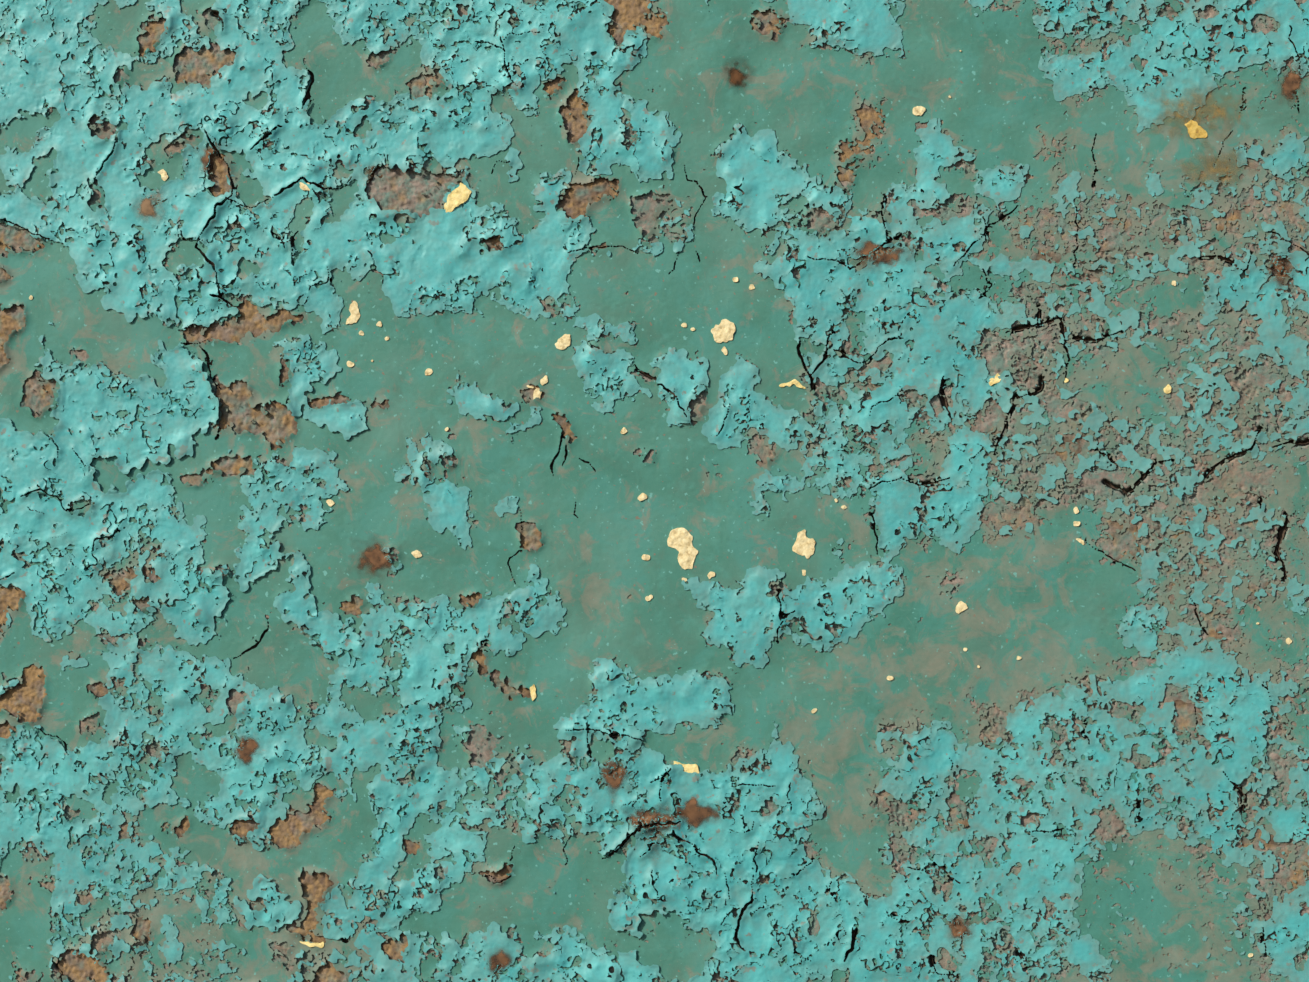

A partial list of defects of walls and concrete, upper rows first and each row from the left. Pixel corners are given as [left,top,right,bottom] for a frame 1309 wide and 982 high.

peeling [968,0,994,16]
crack [304,70,314,105]
peeling [1032,0,1309,139]
peeling [834,104,886,182]
crack [183,125,352,307]
peeling [632,199,694,256]
corrosion [1272,258,1289,281]
crack [796,332,903,390]
peeling [681,118,1309,668]
crack [994,308,1122,454]
crack [1096,448,1172,495]
crack [1205,428,1309,478]